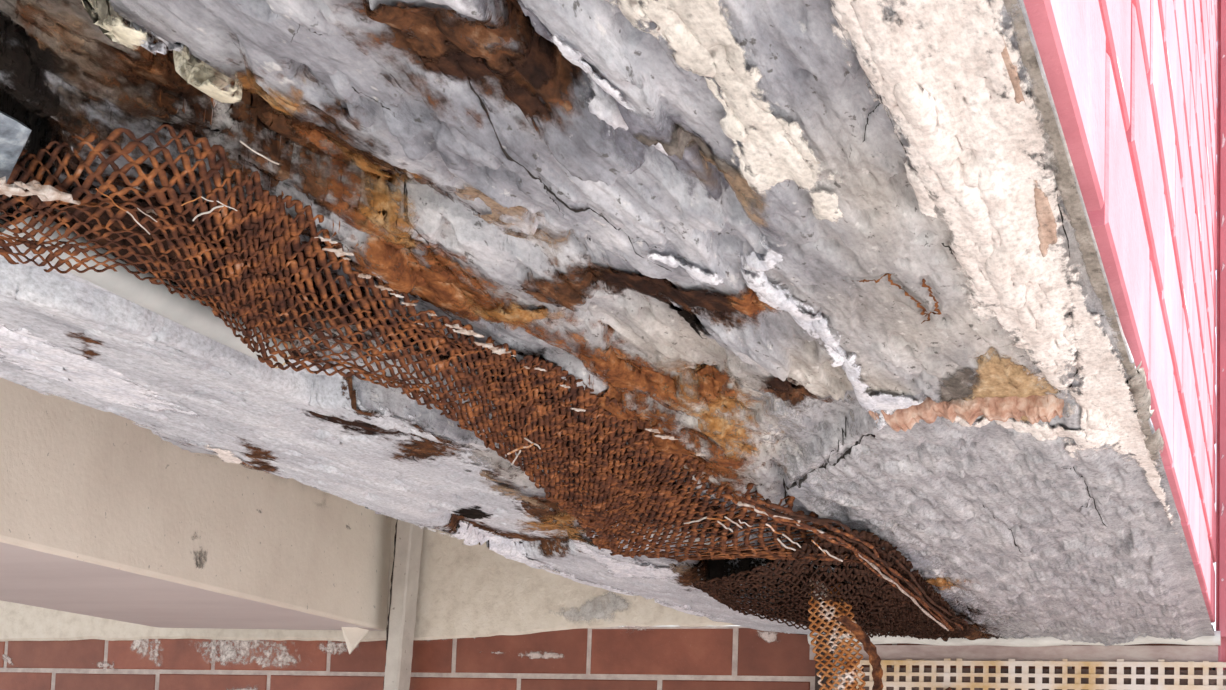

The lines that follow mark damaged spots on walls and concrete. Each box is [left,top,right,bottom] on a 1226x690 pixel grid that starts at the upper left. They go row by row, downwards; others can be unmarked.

spalling [0,0,242,222]
crack [468,79,675,272]
rust [1,0,909,635]
peeling [463,0,1182,545]
peeling [0,240,835,634]
crack [783,418,875,503]
leakage [132,639,160,666]
leakage [216,647,236,662]
rust [905,575,1007,642]